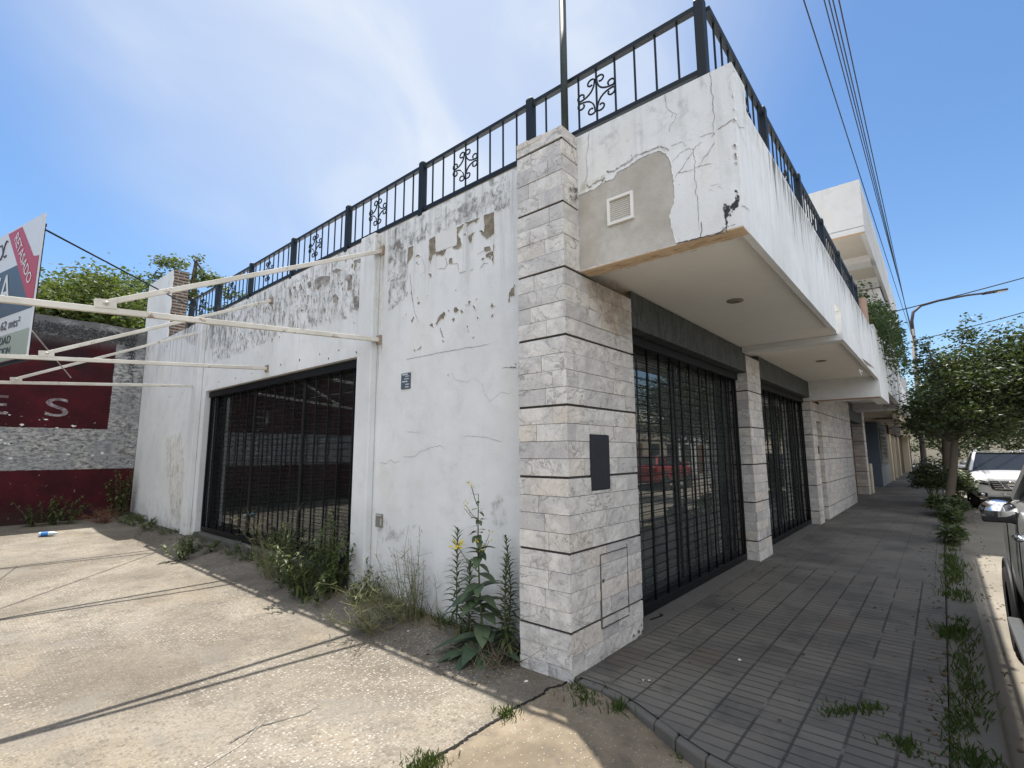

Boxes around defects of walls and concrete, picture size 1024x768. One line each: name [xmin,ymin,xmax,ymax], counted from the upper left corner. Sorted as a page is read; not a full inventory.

crack [664,71,748,244]
peeling [407,211,496,278]
spalling [578,146,677,270]
peeling [214,253,361,353]
peeling [430,284,516,343]
crack [419,681,567,768]